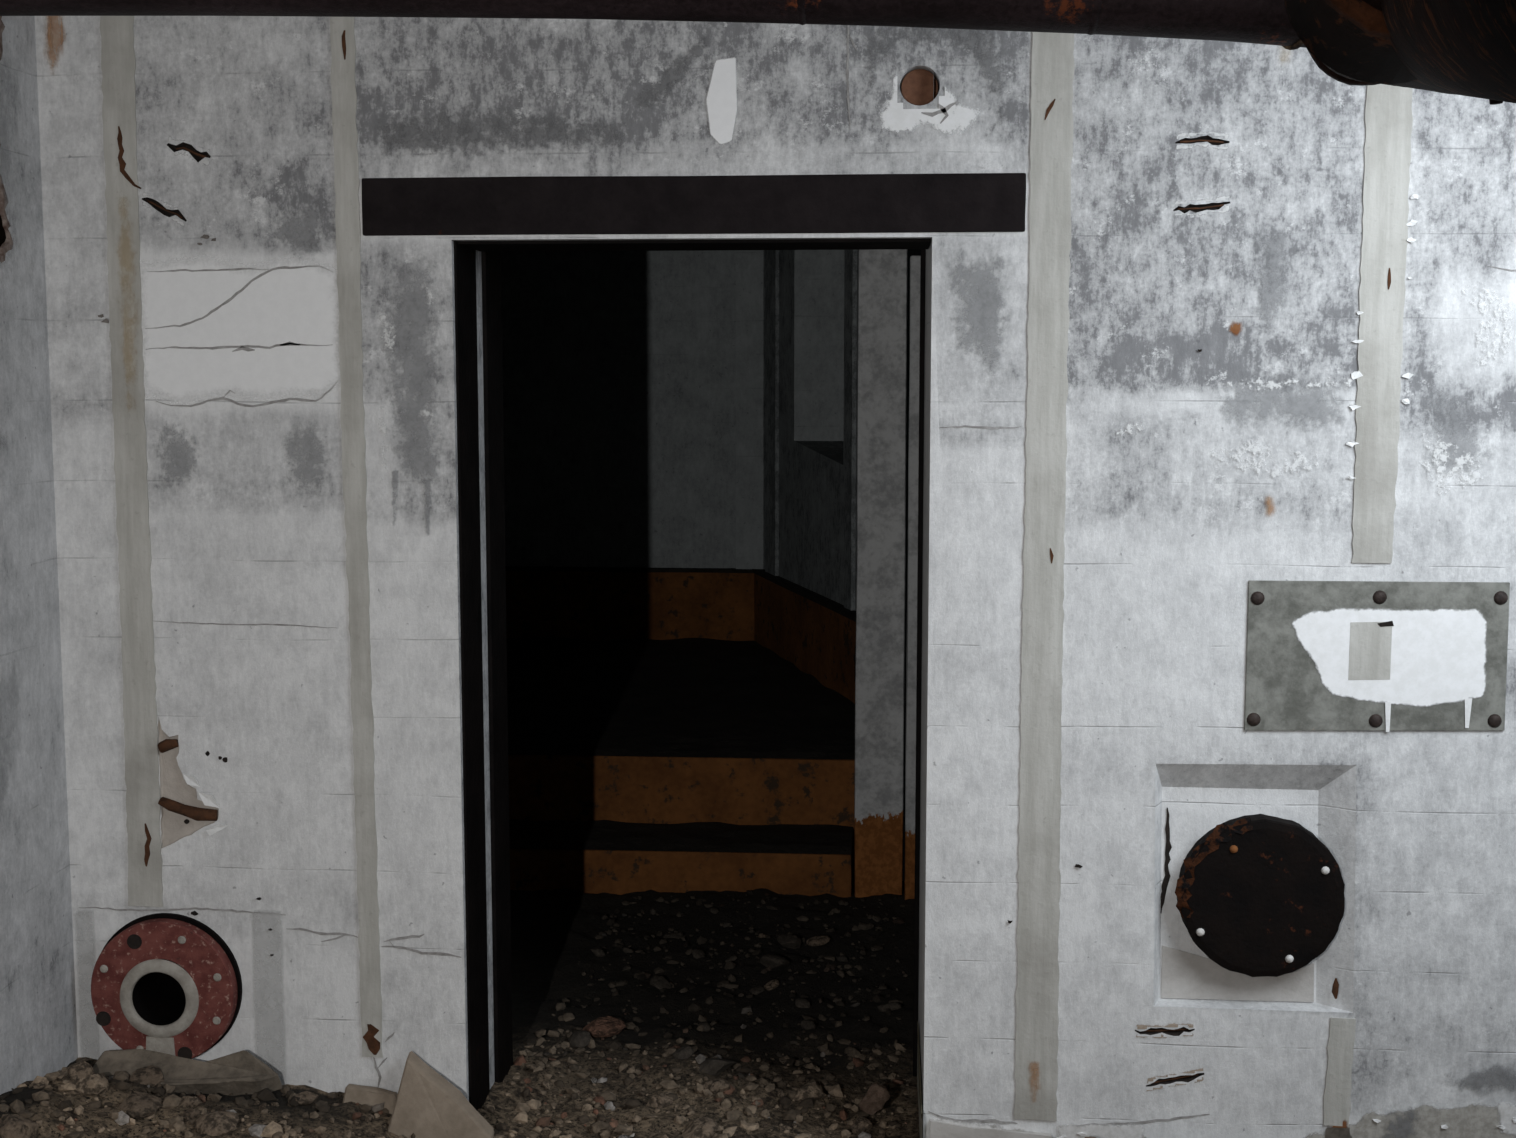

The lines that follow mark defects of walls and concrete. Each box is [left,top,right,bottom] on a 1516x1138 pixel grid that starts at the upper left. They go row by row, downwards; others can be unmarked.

damp [868,27,1003,91]
damp [385,115,622,152]
flaking render [880,69,980,135]
spalling [0,174,13,263]
crack [145,265,333,352]
crack [156,381,338,407]
damp [389,269,437,534]
damp [1222,379,1337,424]
damp [1434,393,1476,468]
flaking render [158,718,227,849]
spalling [1146,1068,1204,1091]
peeling [1347,1102,1516,1138]